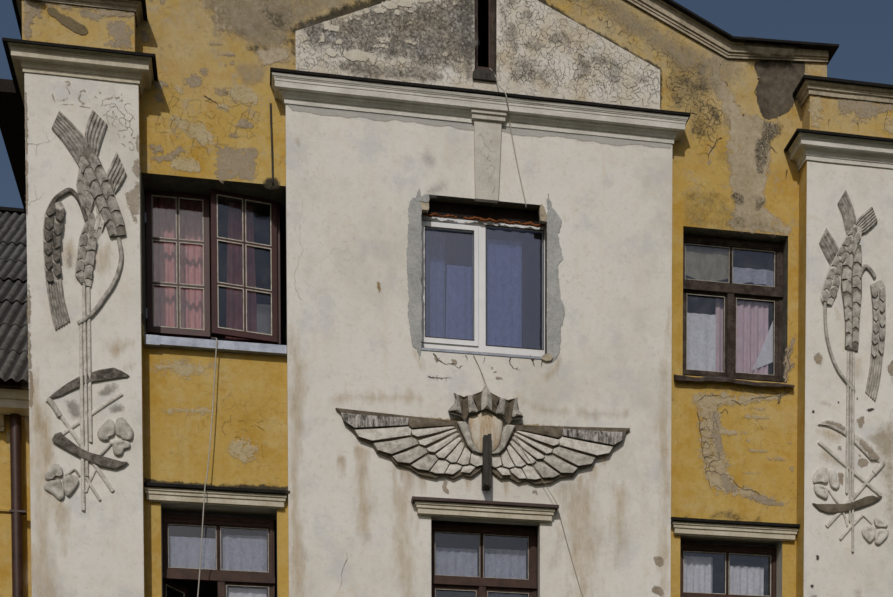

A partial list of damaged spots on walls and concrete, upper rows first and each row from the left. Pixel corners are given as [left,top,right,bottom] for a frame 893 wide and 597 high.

peeling [23,0,150,49]
peeling [256,46,290,65]
crack [299,0,471,81]
water stain [305,0,477,81]
crack [498,0,722,159]
peeling [215,119,259,181]
peeling [708,53,805,235]
peeling [783,335,796,382]
peeling [693,391,794,506]